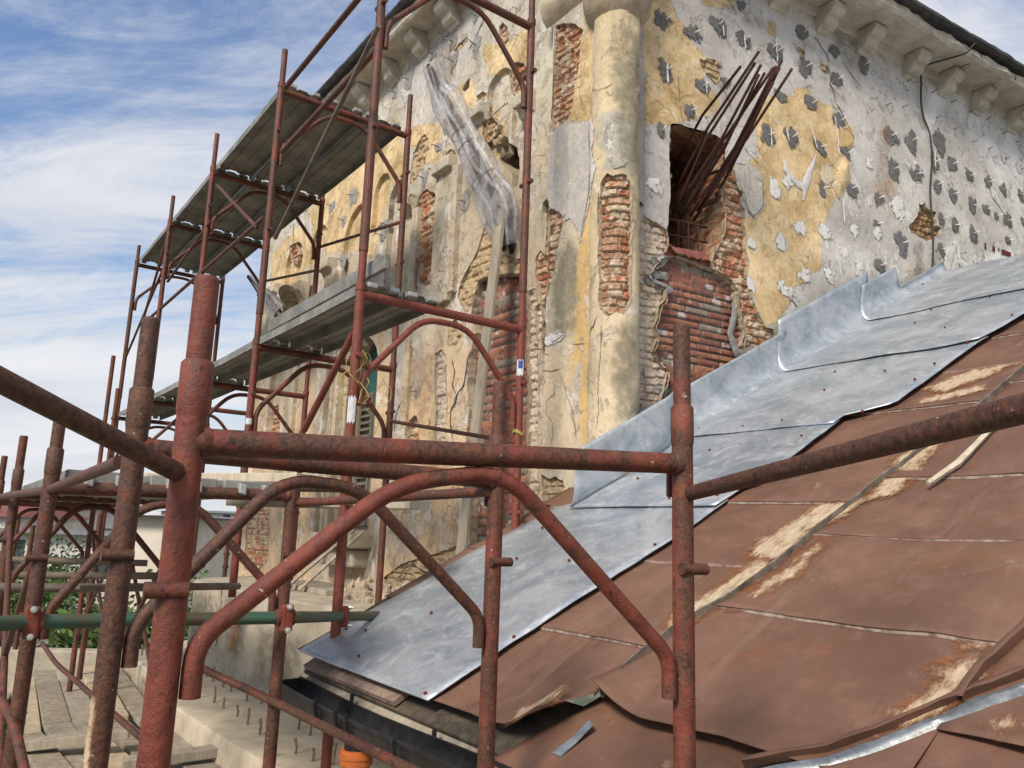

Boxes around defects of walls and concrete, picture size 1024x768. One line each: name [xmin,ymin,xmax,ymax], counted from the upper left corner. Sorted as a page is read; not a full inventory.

flaking render [410,134,435,285]
crack [428,351,470,436]
flaking render [434,221,520,441]
flaking render [526,23,670,446]
flaking render [699,58,722,84]
flaking render [708,163,776,353]
flaking render [839,126,854,149]
flaking render [909,203,941,241]